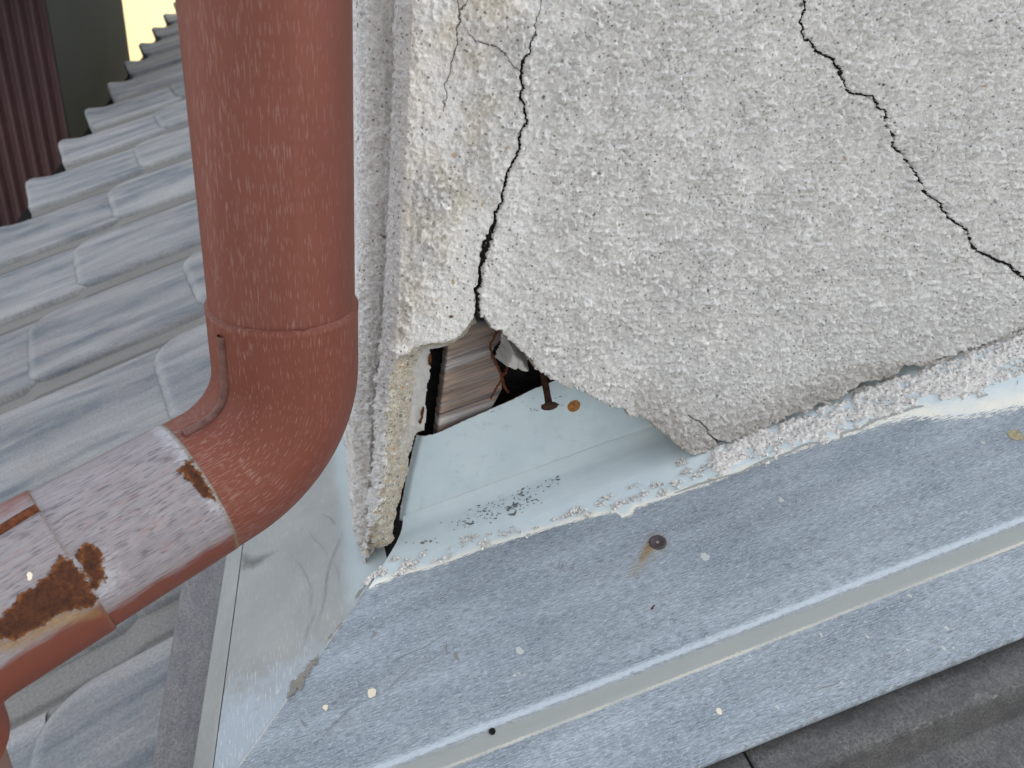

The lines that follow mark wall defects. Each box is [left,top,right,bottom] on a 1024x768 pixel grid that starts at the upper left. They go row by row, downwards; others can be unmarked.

crack [442,0,542,319]
crack [798,0,1024,280]
rust [0,542,108,641]
rust [177,458,216,501]
spalling [362,311,692,563]